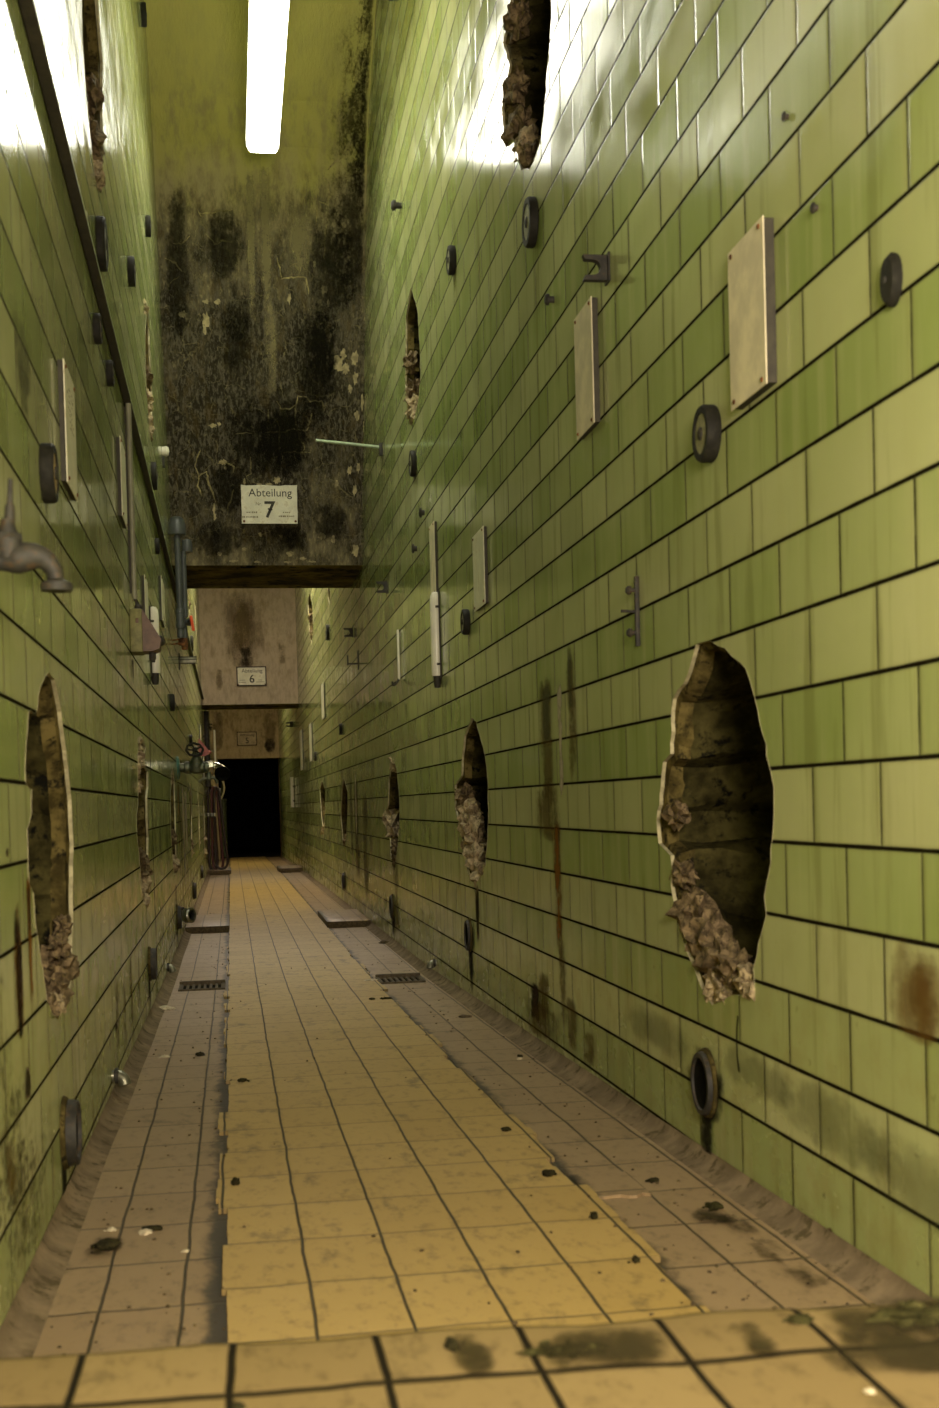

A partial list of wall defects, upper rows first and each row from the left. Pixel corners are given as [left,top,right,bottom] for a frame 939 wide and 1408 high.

spalling [82,0,107,192]
spalling [500,0,551,170]
water stain [166,193,189,338]
water stain [198,0,373,555]
spalling [25,672,80,1020]
spalling [136,736,153,908]
spalling [454,718,488,940]
spalling [656,641,774,1006]
water stain [0,1071,45,1260]